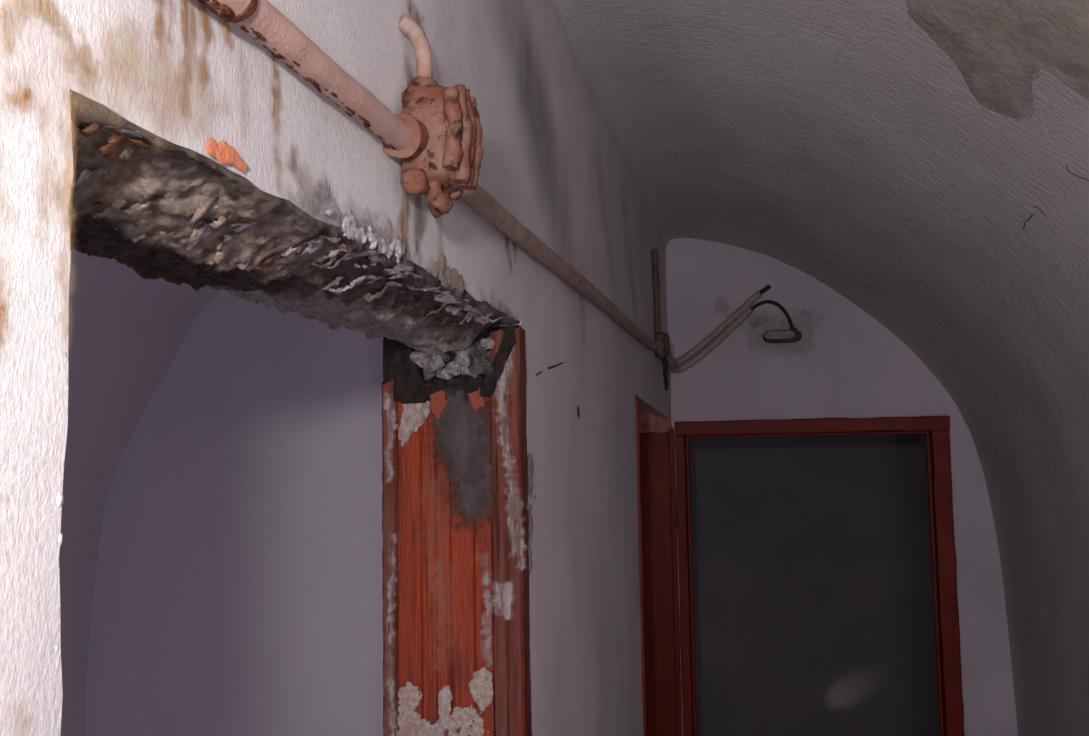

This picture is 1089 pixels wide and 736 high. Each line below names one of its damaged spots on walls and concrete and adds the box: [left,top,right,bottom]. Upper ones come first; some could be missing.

flaking render [903,0,1089,121]
spalling [75,123,150,183]
spalling [76,199,157,230]
spalling [132,180,514,447]
peeling [399,708,482,736]